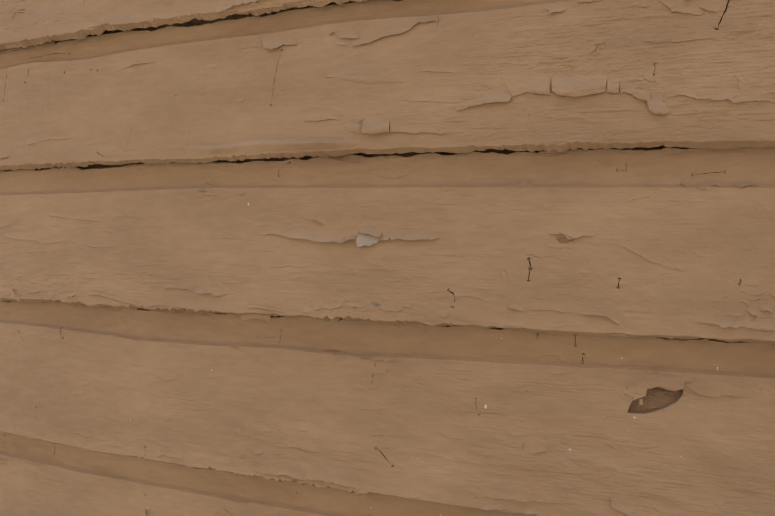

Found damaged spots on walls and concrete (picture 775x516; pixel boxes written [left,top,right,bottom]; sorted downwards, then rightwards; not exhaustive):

peeling [458,75,669,115]
peeling [622,366,750,415]